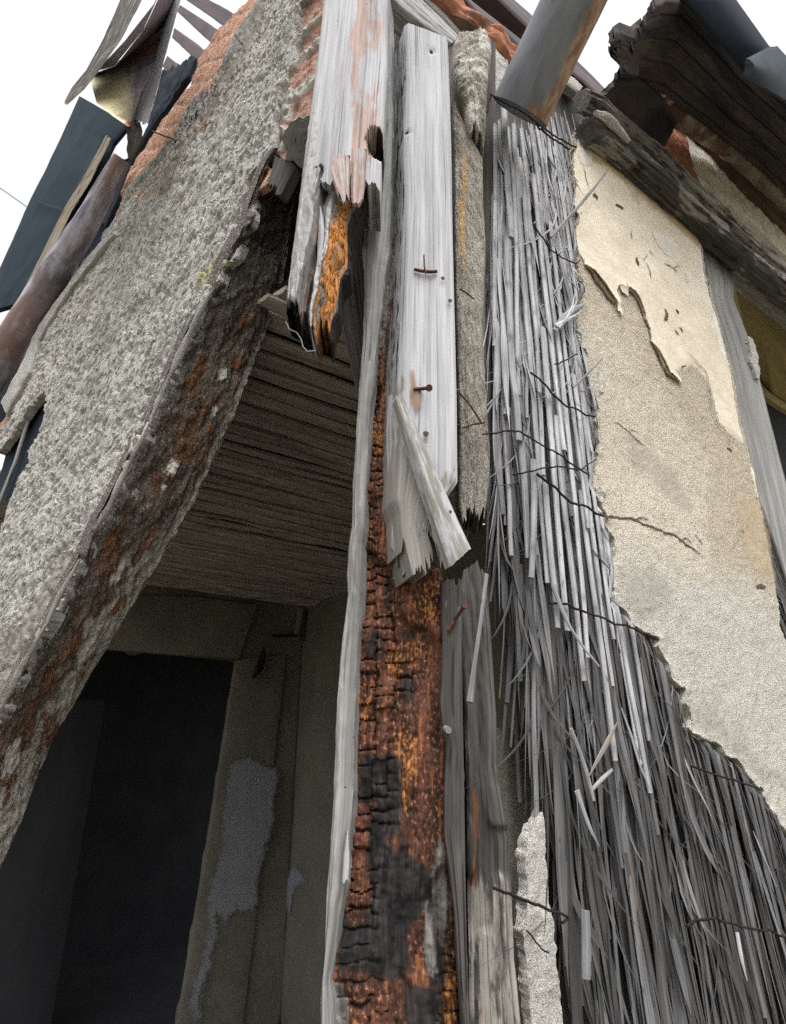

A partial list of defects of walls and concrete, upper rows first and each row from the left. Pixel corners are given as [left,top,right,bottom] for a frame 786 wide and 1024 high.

flaking render [584,257,686,384]
spalling [587,370,606,397]
crack [598,511,706,558]